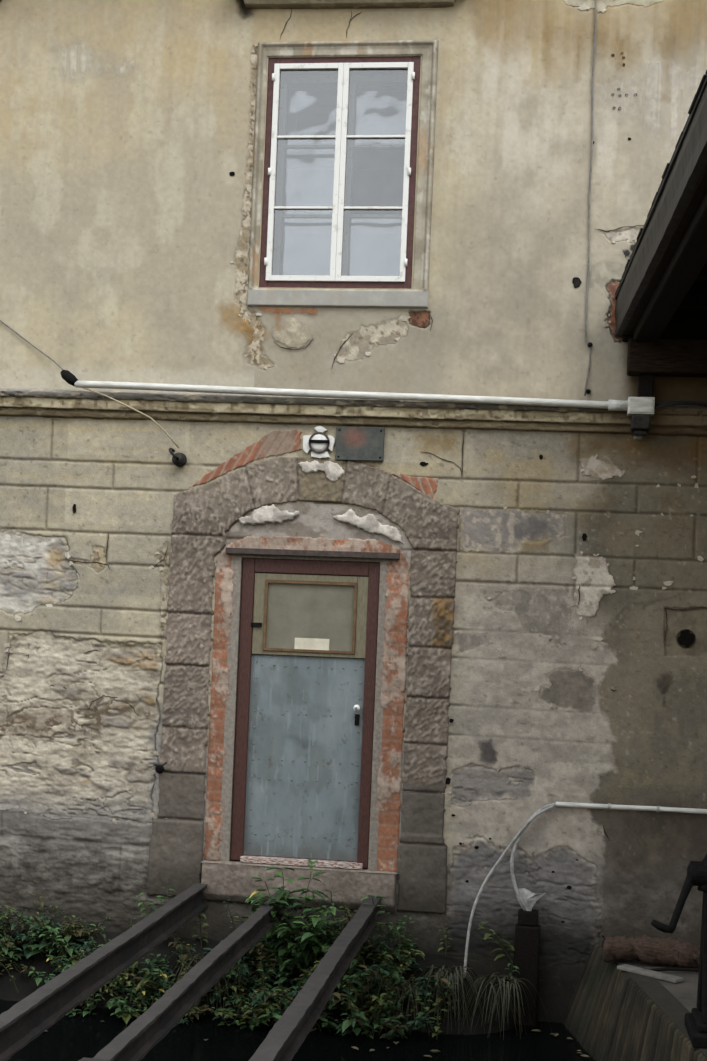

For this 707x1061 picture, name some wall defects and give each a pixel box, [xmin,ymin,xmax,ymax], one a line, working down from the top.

peeling [563,0,664,13]
water stain [621,61,699,150]
peeling [230,44,276,369]
peeling [596,225,644,243]
peeling [332,312,433,367]
peeling [579,454,625,480]
peeling [486,551,616,650]
spalling [0,529,171,824]
peeling [534,668,596,712]
spalling [446,739,534,817]
spalling [443,836,602,967]